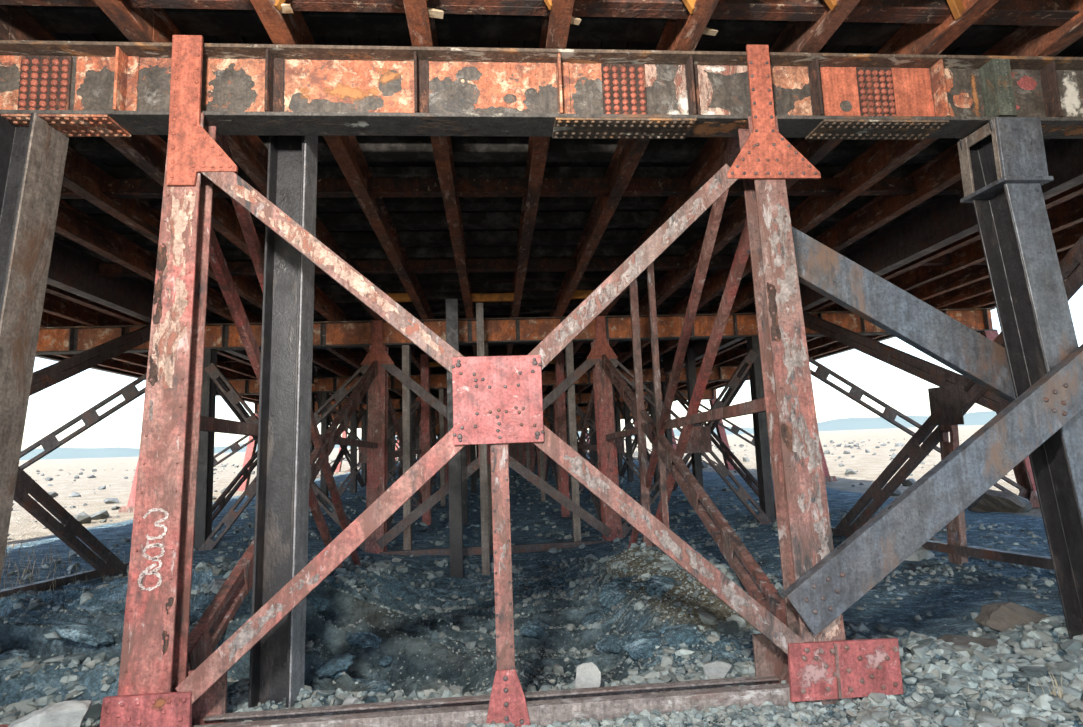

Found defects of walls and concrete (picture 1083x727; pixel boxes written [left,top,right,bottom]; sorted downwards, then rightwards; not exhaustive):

peeling [284,59,415,113]
corrosion [326,69,401,100]
peeling [429,61,602,114]
corrosion [971,75,980,117]
corrosion [688,120,747,136]
corrosion [152,243,167,324]
corrosion [766,282,781,342]
corrosion [148,356,158,386]
corrosion [780,423,793,452]
corrosion [797,649,834,688]
corrosion [866,649,888,669]